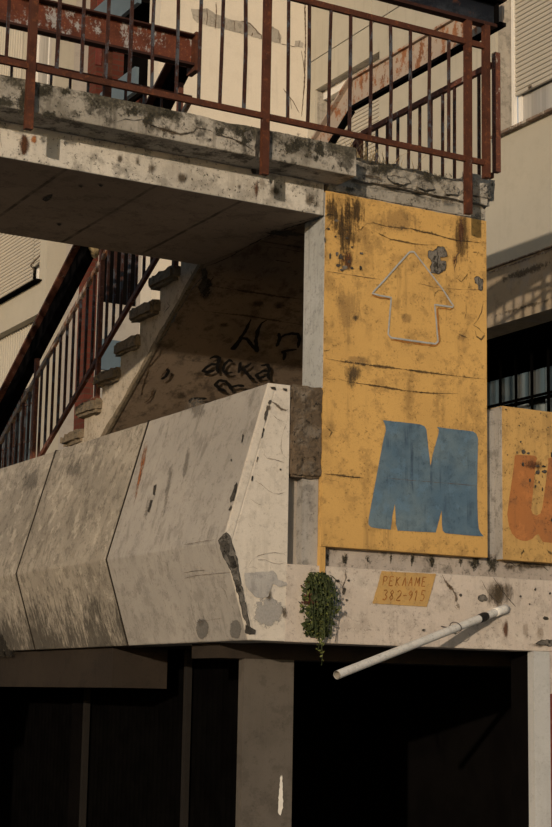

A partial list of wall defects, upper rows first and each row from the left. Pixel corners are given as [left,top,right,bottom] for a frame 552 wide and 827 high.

peeling [191,5,262,39]
peeling [272,26,303,48]
spalling [218,532,256,635]